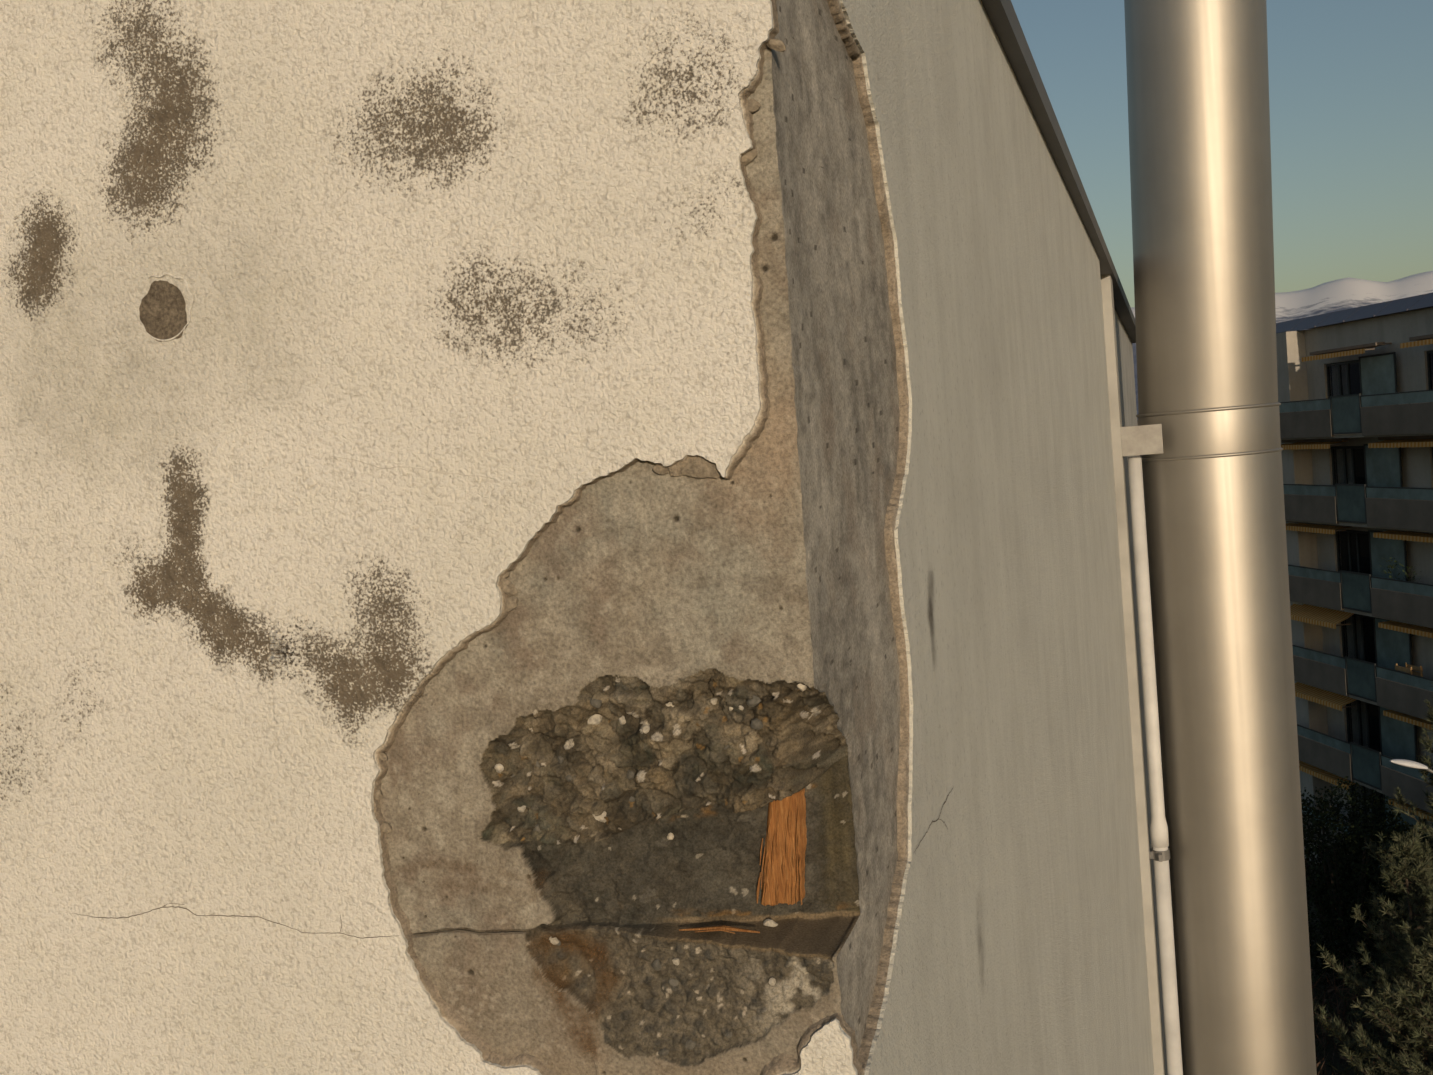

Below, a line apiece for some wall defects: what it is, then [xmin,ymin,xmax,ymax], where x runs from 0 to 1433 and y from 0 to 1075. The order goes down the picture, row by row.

damp [96,0,222,238]
damp [336,56,502,191]
mould [628,20,742,136]
damp [4,192,77,320]
flaking render [139,273,194,342]
damp [432,255,621,368]
damp [116,444,432,743]
spalling [373,0,910,1075]
crack [66,903,304,933]
crack [340,916,527,938]